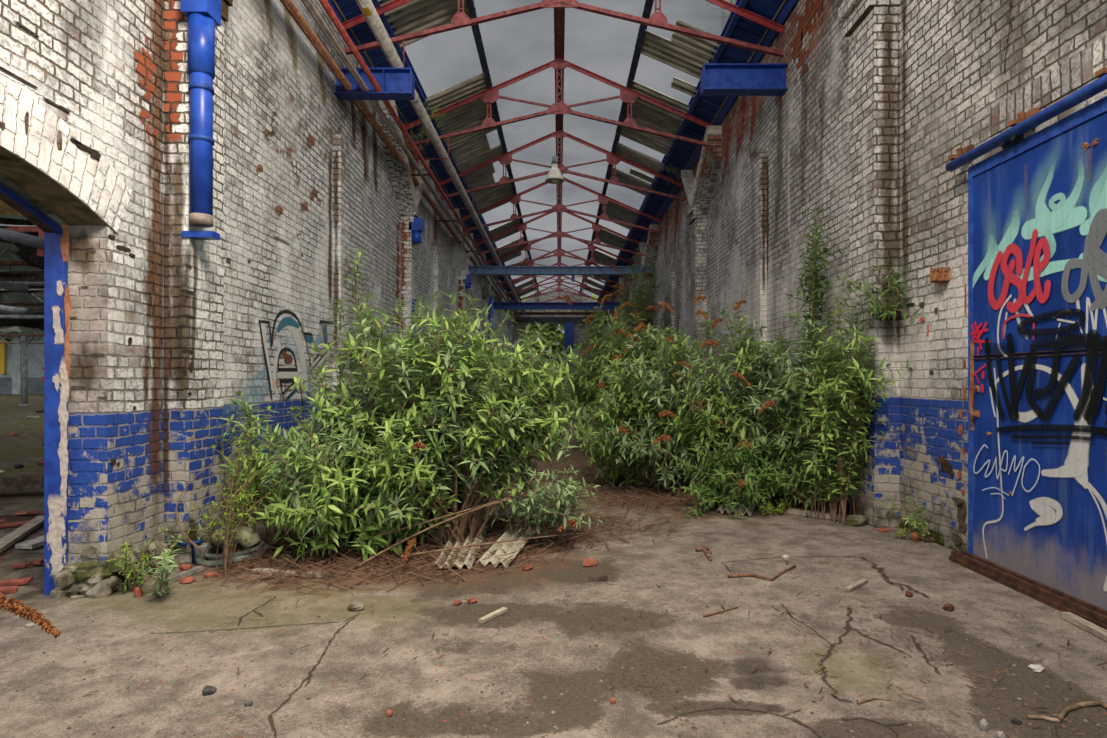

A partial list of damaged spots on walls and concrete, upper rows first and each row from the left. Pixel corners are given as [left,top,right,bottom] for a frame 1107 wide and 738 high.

peeling [134,0,183,145]
corrosion [285,9,297,67]
corrosion [350,100,377,192]
corrosion [144,0,172,489]
peeling [52,281,65,344]
peeling [958,386,966,454]
spalling [45,360,170,599]
spalling [910,457,967,545]
crack [723,556,928,598]
crack [151,596,356,738]
crack [781,603,942,738]
crack [657,707,822,738]